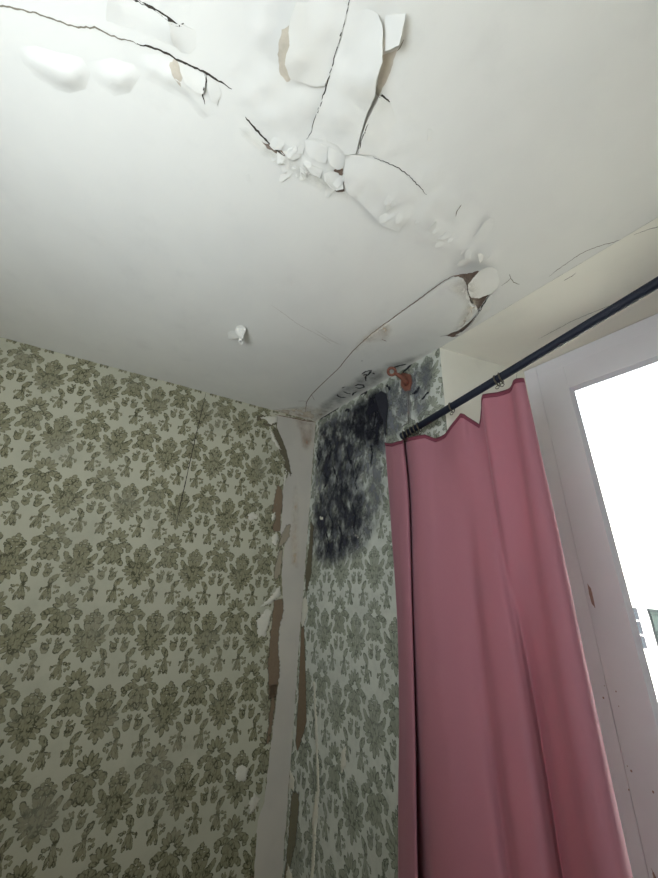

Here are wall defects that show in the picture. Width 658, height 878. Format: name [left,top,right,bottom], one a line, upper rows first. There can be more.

crack [0,5,231,104]
crack [134,0,184,27]
peeling [106,0,221,105]
crack [245,117,284,156]
peeling [263,0,420,233]
peeling [227,325,246,345]
crack [273,273,470,422]
peeling [355,247,499,357]
damp [305,364,429,561]
flaking render [248,415,316,878]
flaking render [235,765,249,782]